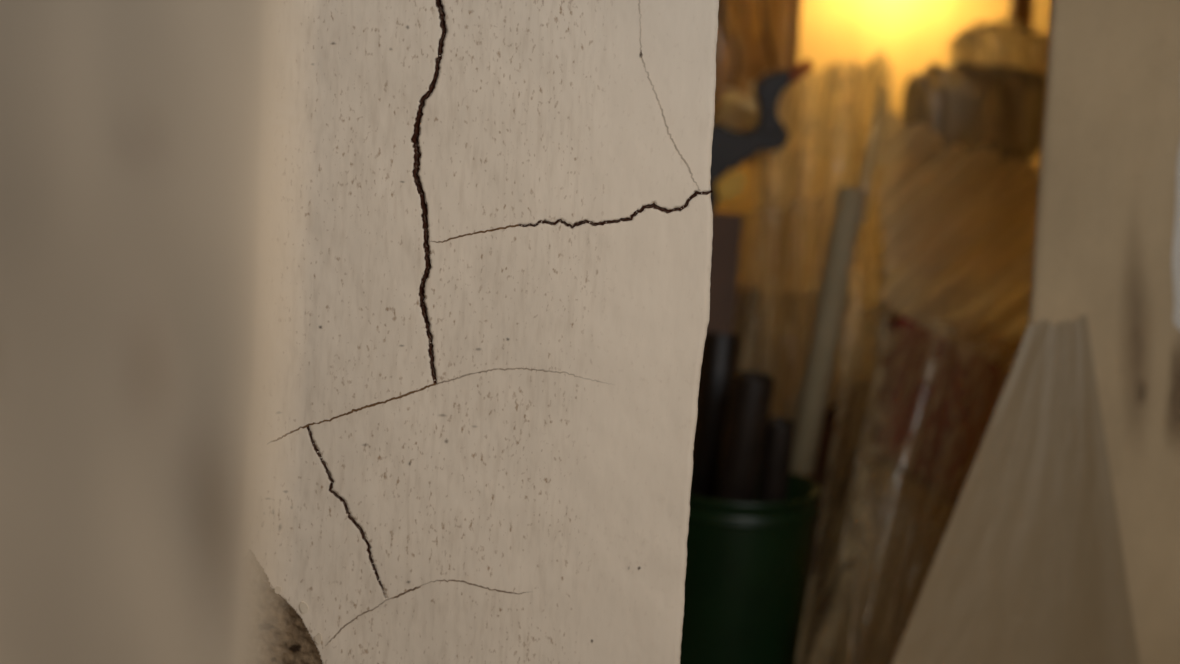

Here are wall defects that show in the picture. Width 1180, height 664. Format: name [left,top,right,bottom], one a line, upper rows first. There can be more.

spalling [263,578,322,664]
crack [275,0,713,638]